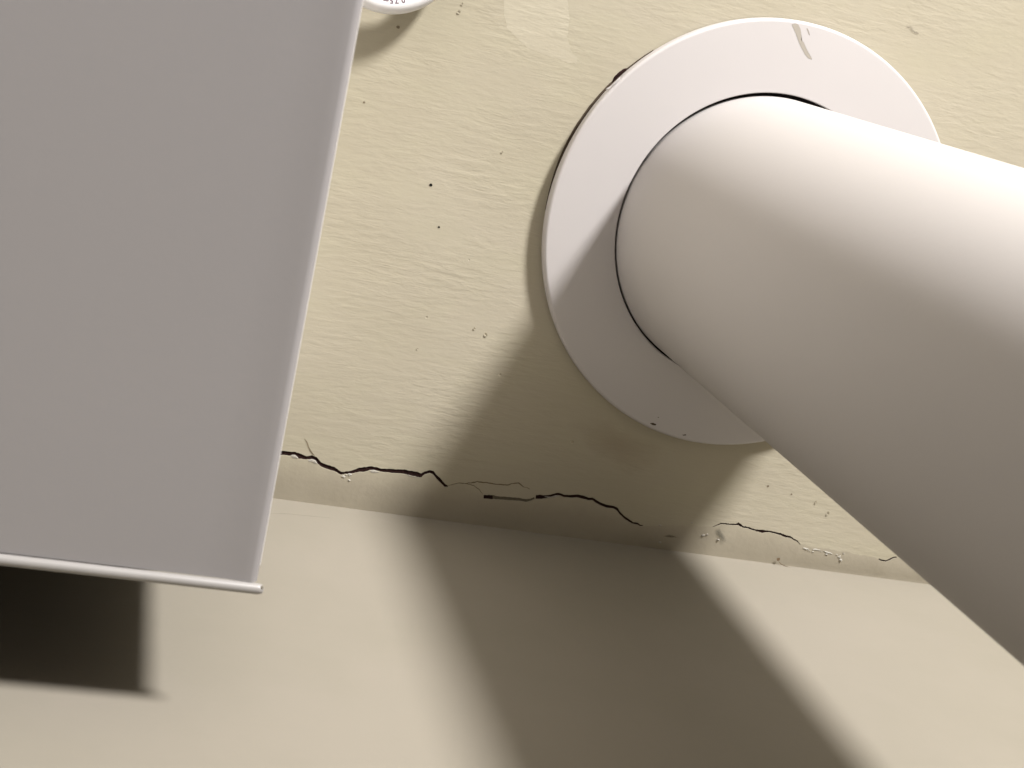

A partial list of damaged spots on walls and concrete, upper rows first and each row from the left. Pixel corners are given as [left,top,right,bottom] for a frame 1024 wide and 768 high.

crack [281,440,643,526]
crack [713,522,800,544]